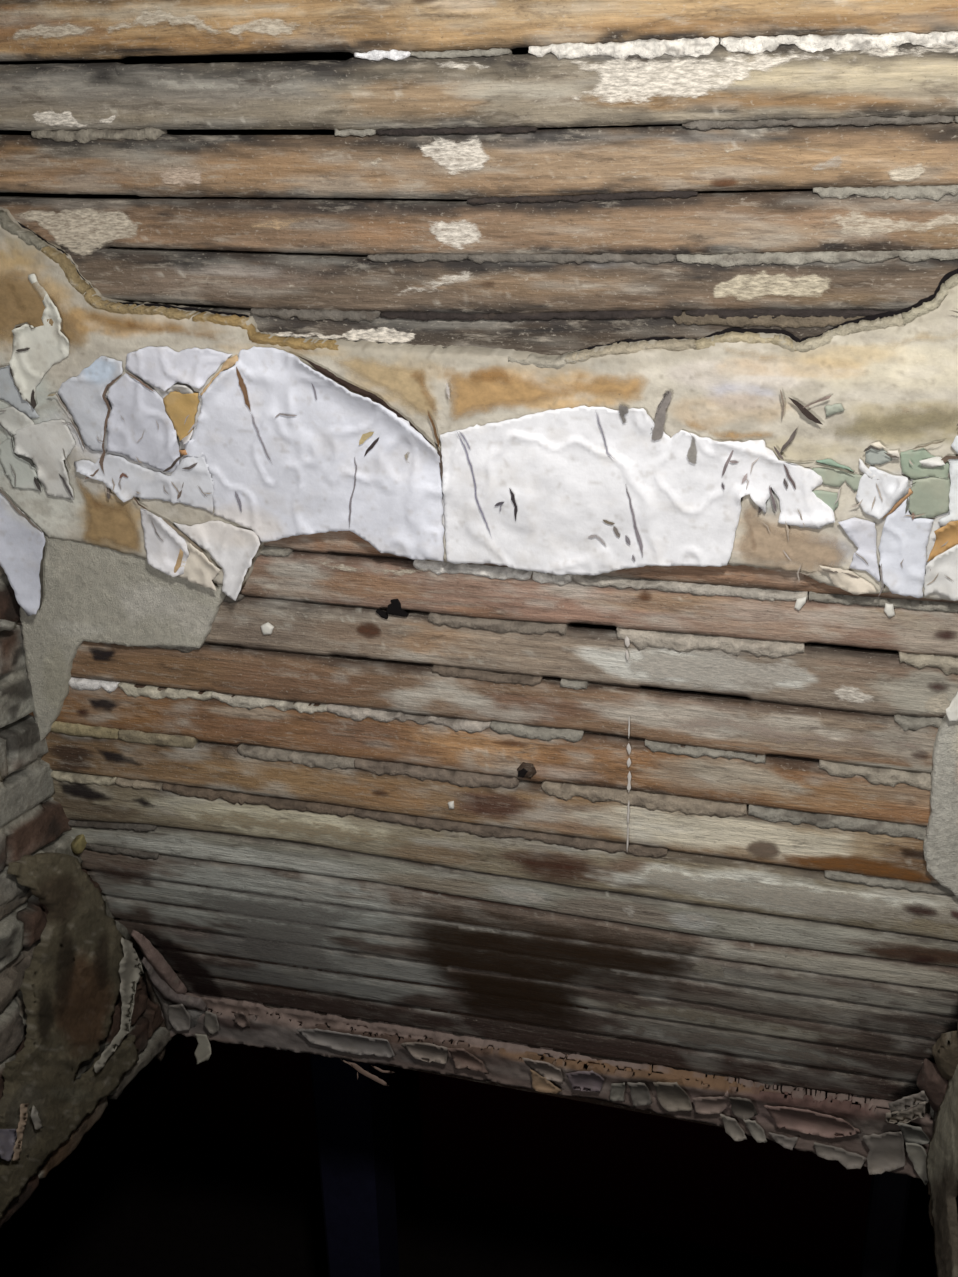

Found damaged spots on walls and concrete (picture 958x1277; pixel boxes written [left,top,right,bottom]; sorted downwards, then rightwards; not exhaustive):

peeling [0,210,958,741]
water stain [143,931,223,997]
water stain [417,913,685,1028]
water stain [866,948,958,964]
spalling [0,852,220,1219]
peeling [297,1028,489,1074]
water stain [939,1006,958,1038]
water stain [895,1071,921,1100]
peeling [522,1022,958,1277]